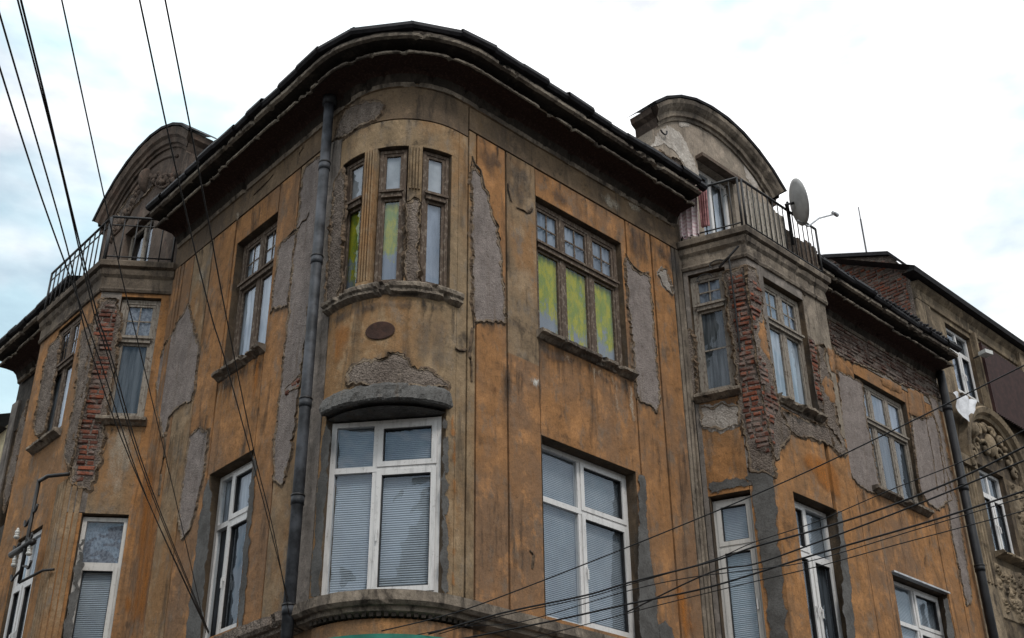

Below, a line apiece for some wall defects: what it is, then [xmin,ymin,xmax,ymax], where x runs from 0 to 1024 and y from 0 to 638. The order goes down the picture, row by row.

peeling [334,99,386,141]
peeling [2,334,63,514]
flaking render [64,297,124,493]
peeling [155,303,201,438]
peeling [177,427,211,541]
peeling [269,156,320,488]
peeling [324,167,348,302]
peeling [345,351,451,391]
peeling [467,163,508,326]
peeling [623,257,675,415]
flaking render [687,260,973,607]